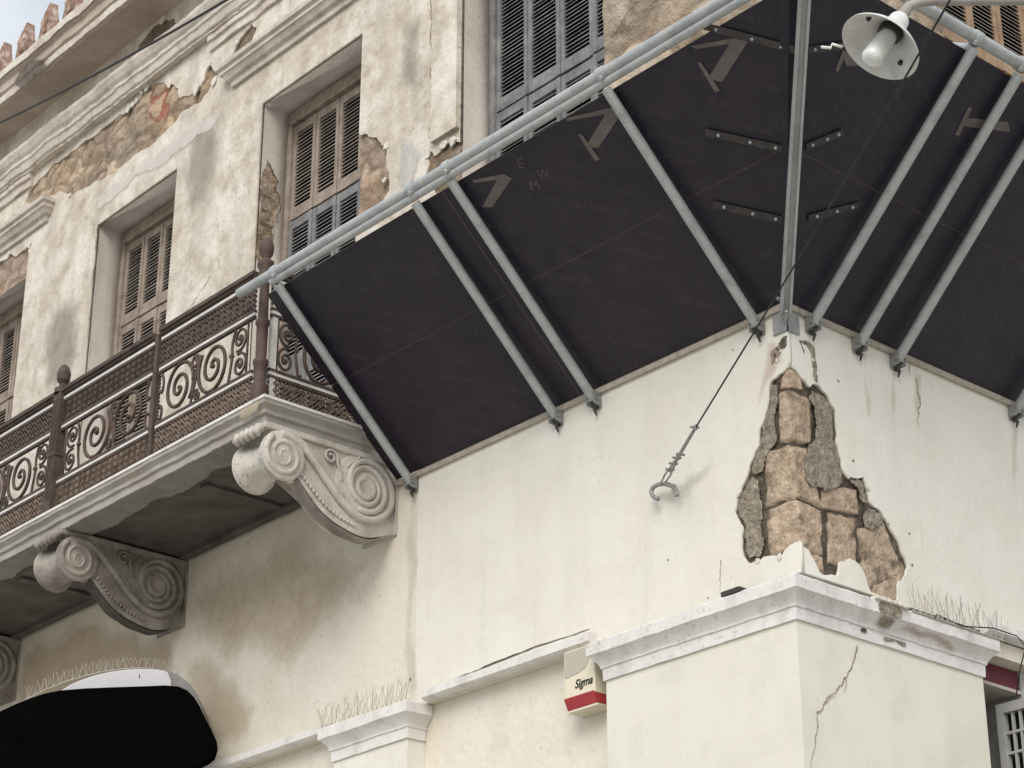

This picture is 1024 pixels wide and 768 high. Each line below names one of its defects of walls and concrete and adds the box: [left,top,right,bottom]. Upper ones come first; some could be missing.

spalling [26,60,225,209]
spalling [255,160,281,259]
spalling [359,136,462,215]
spalling [0,241,32,296]
crack [909,364,921,424]
spalling [735,335,913,647]
crack [811,646,858,760]